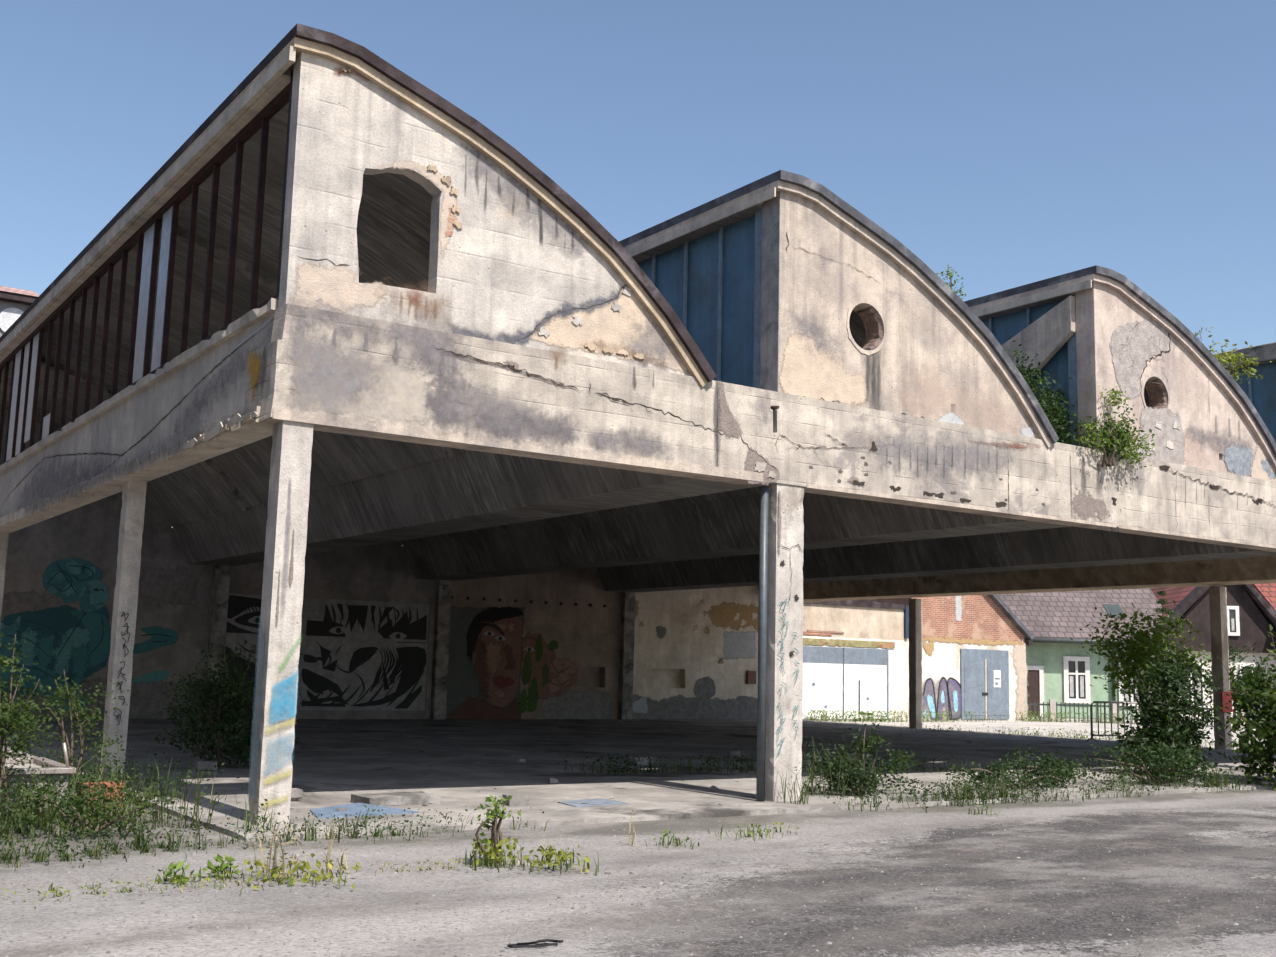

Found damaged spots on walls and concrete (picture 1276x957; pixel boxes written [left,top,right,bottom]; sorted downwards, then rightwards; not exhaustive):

spalling [379,160,463,257]
damp [465,150,583,255]
damp [290,302,574,443]
crack [436,348,737,438]
peeling [779,334,869,405]
peeling [1110,318,1185,465]
spalling [741,436,780,485]
damp [880,432,1013,475]
crack [1160,465,1275,525]
peeling [693,599,759,634]